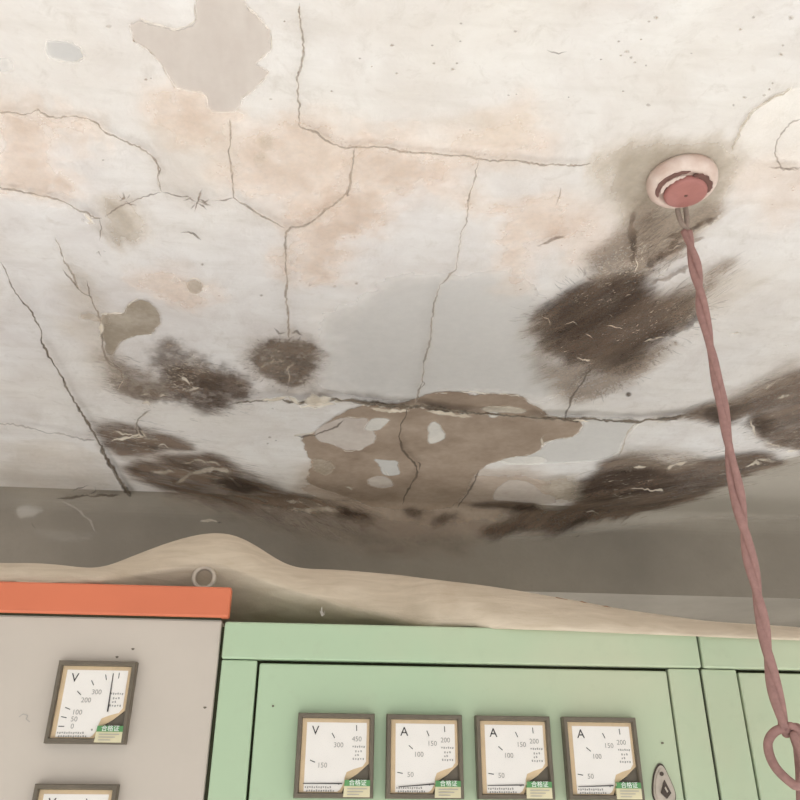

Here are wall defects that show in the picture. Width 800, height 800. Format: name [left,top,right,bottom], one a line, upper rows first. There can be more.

peeling [129,0,272,113]
crack [770,119,800,171]
crack [0,4,688,507]
peeling [80,298,161,356]
leakage [93,115,741,553]
peeling [294,391,583,511]
leakage [727,362,800,483]